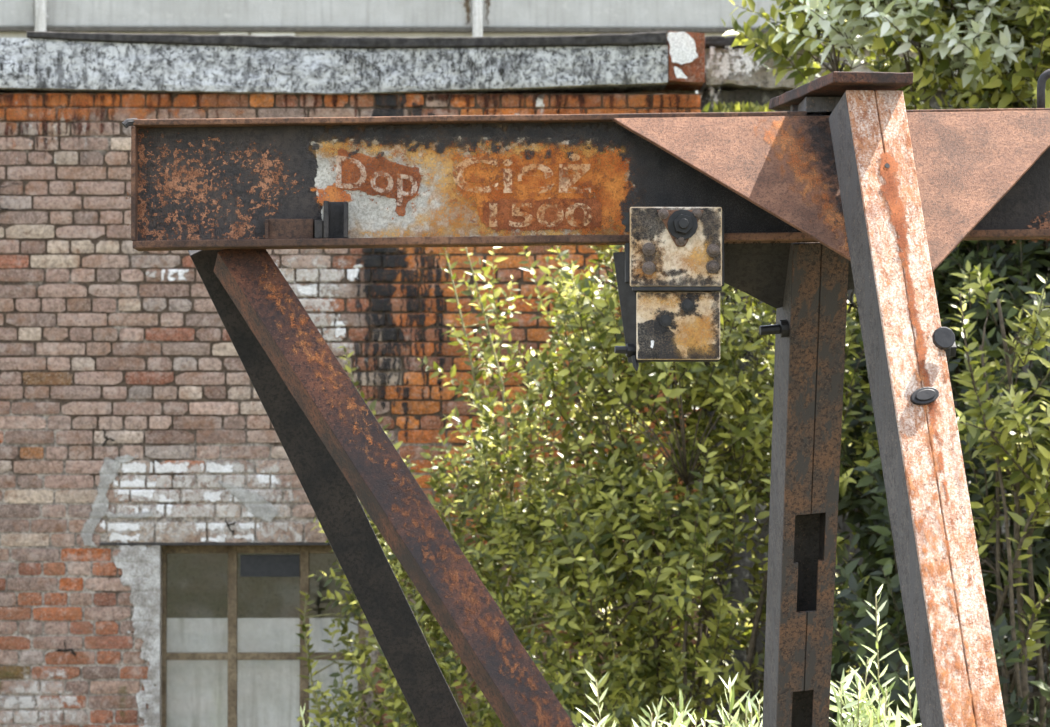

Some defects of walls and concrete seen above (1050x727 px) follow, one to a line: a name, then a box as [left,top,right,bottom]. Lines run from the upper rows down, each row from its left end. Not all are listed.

corrosion [0,94,635,255]
peeling [311,136,635,238]
corrosion [756,119,849,254]
corrosion [880,152,916,318]
corrosion [259,275,340,389]
leakage [276,247,451,442]
corrosion [675,314,716,355]
peeling [59,455,302,727]
corrosion [385,460,569,727]
corrosion [889,357,975,727]